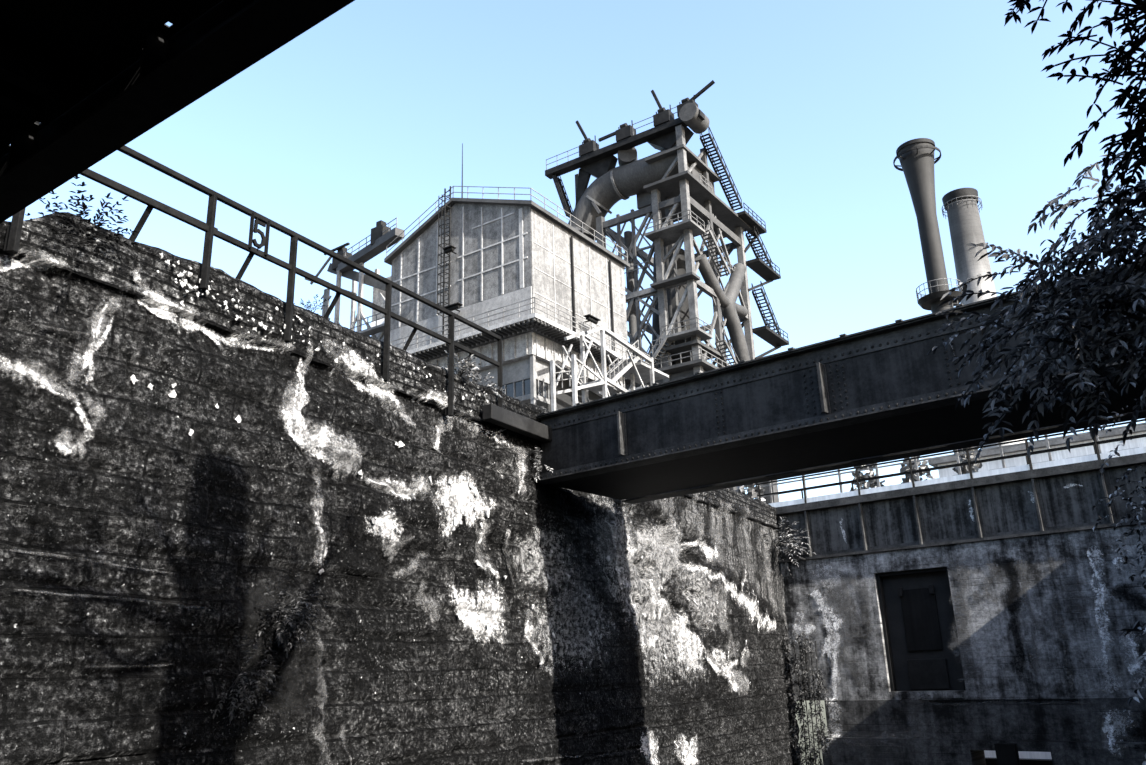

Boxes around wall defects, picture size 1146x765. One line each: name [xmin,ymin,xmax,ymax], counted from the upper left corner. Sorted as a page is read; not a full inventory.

leakage [0,250,66,271]
leakage [0,298,120,459]
leakage [132,269,526,563]
leakage [949,557,1038,682]
leakage [1049,545,1146,694]
leakage [1102,709,1146,757]